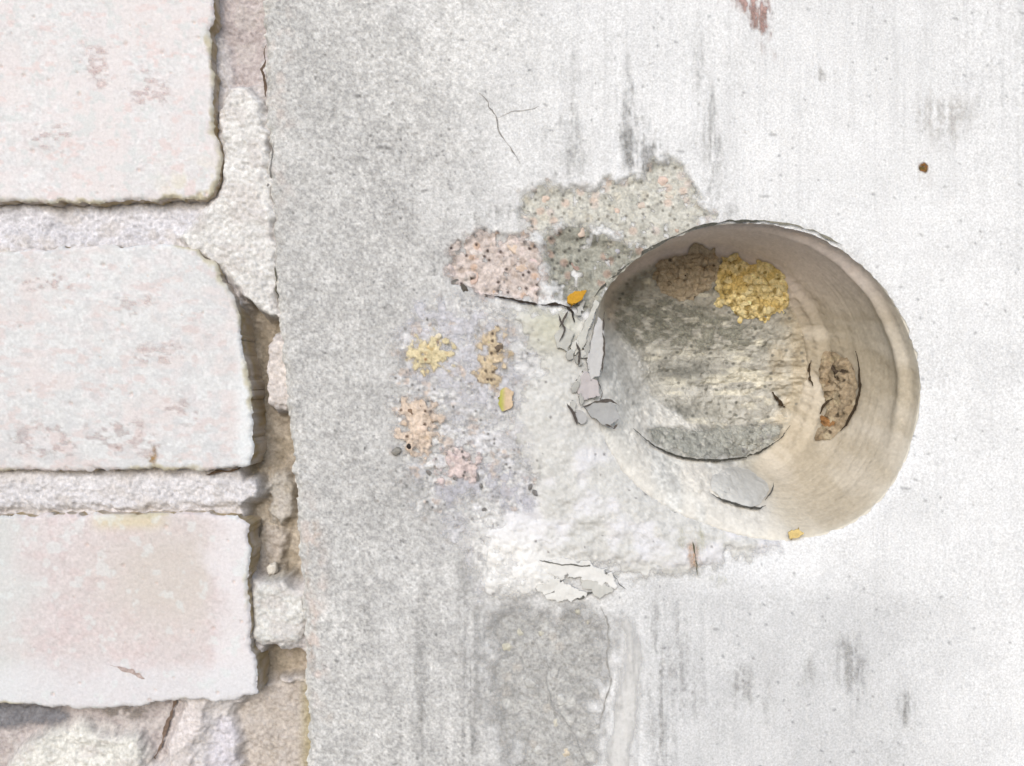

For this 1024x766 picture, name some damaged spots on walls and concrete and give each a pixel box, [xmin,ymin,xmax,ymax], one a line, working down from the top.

crack [478,92,539,163]
spalling [387,158,719,553]